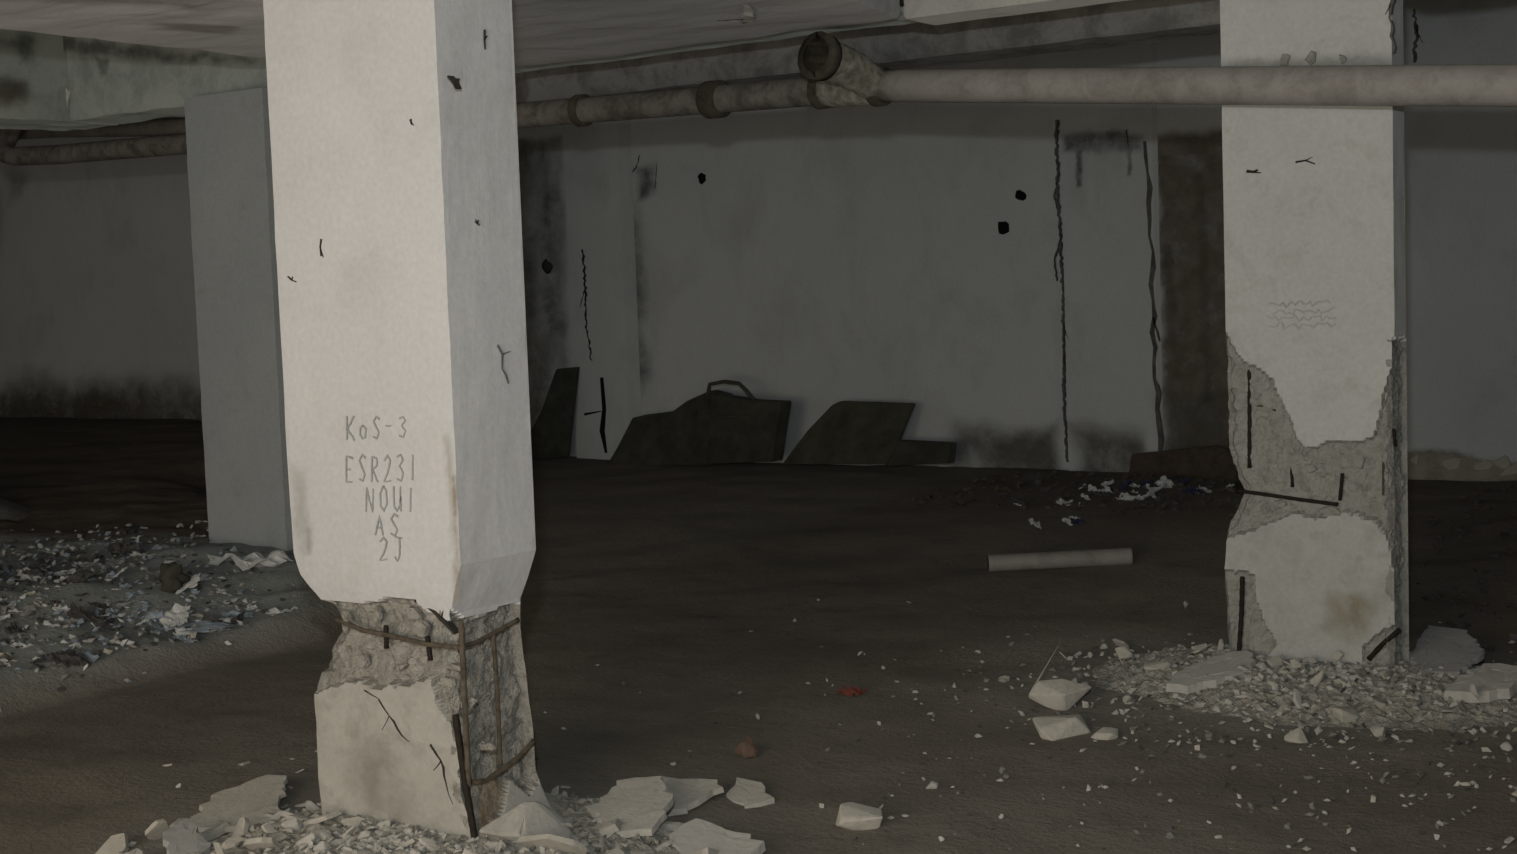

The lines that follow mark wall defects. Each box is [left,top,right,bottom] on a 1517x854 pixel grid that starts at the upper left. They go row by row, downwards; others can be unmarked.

crack [1385,0,1423,63]
water stain [0,387,202,421]
crack [1053,120,1069,462]
spalling [1225,335,1517,670]
spalling [315,597,540,838]